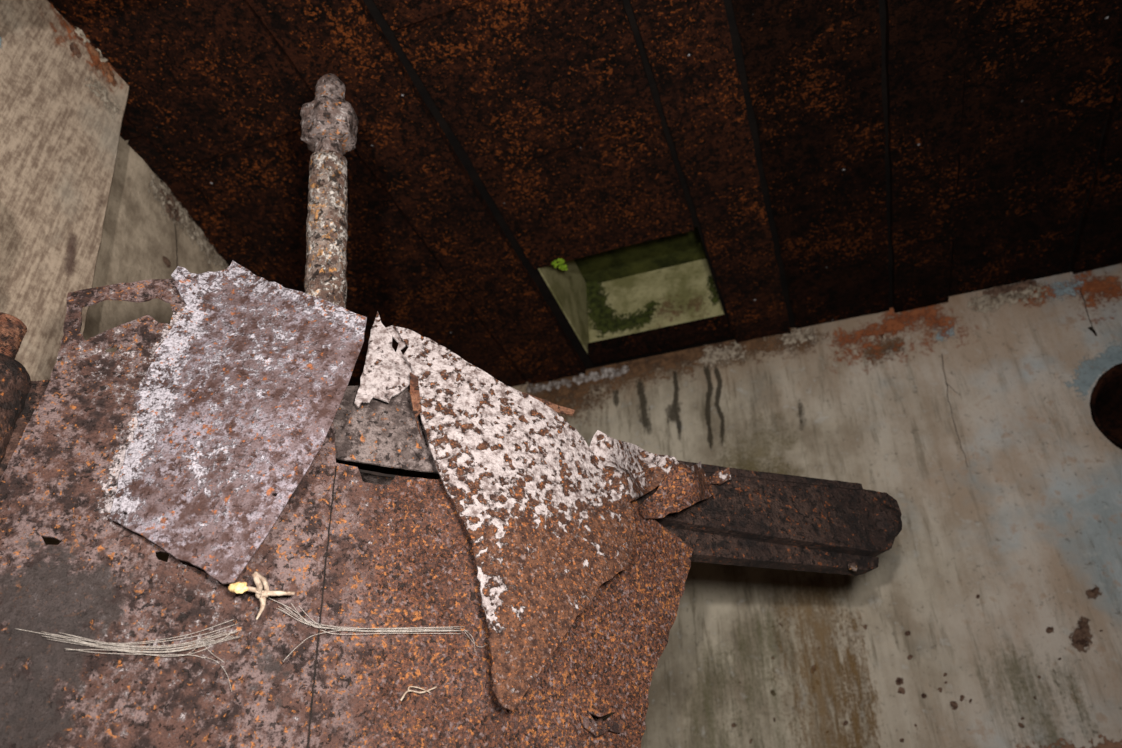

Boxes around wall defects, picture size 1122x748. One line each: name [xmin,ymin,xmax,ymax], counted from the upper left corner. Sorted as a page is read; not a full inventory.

corrosion [1063,270,1122,324]
corrosion [830,305,963,372]
damp [527,328,828,448]